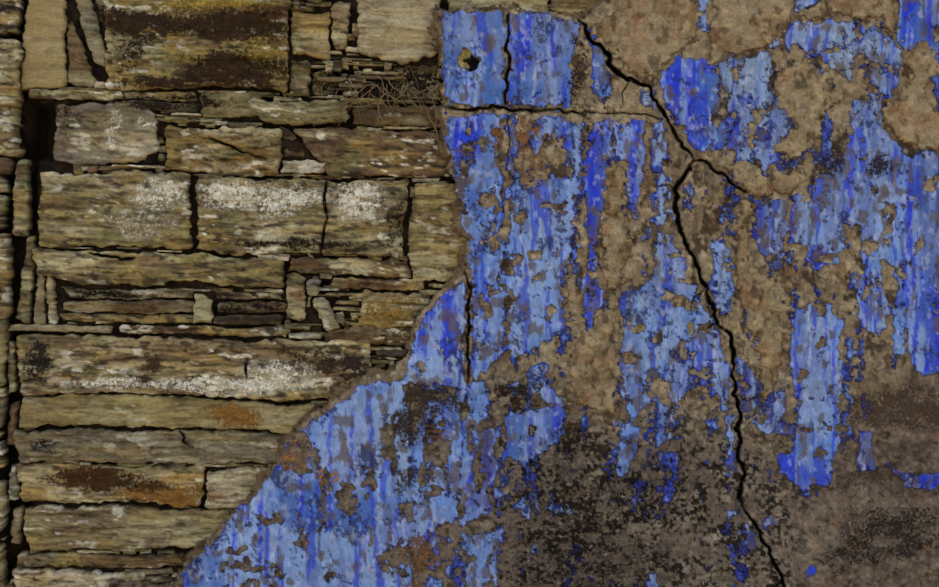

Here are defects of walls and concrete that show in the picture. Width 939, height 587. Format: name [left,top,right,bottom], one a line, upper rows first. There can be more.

spalling [59,81,120,91]
spalling [73,137,256,177]
peeling [125,3,646,587]
crack [445,13,785,587]
peeling [601,0,939,532]
spalling [49,547,176,555]
peeling [633,573,659,587]
peeling [722,510,775,587]